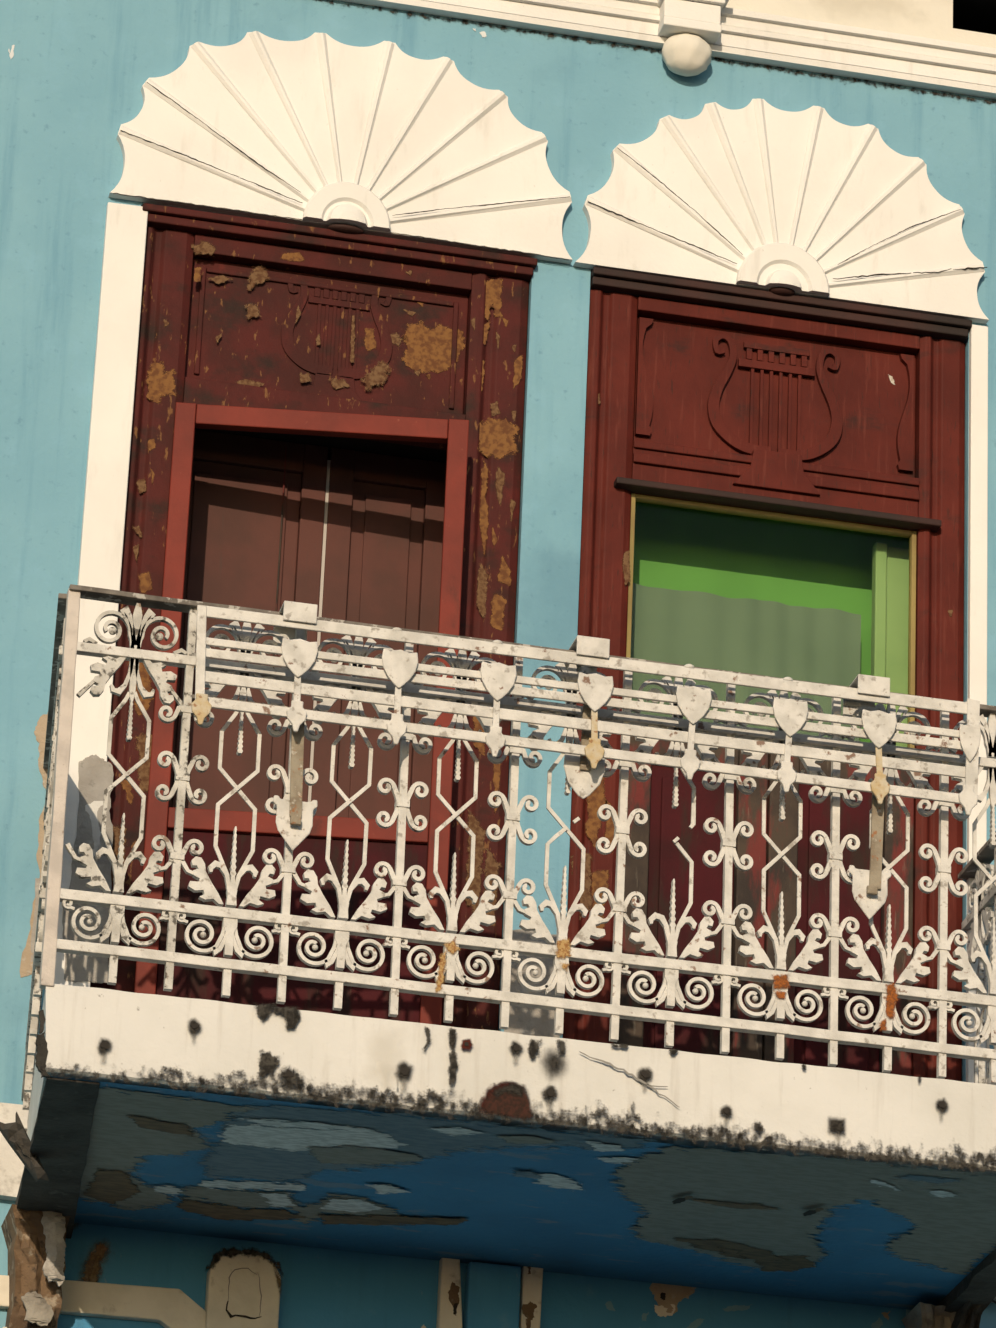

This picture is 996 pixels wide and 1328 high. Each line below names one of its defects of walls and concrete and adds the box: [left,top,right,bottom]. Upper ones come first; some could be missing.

peeling [191,241,269,319]
peeling [329,279,523,630]
spalling [35,1010,51,1078]
damp [254,1003,300,1030]
corrosion [435,941,460,992]
corrosion [556,939,571,971]
corrosion [773,974,789,999]
corrosion [879,983,898,1031]
damp [40,1028,996,1173]
spalling [0,1112,49,1183]
peeling [79,1087,996,1275]
spalling [21,1211,66,1327]